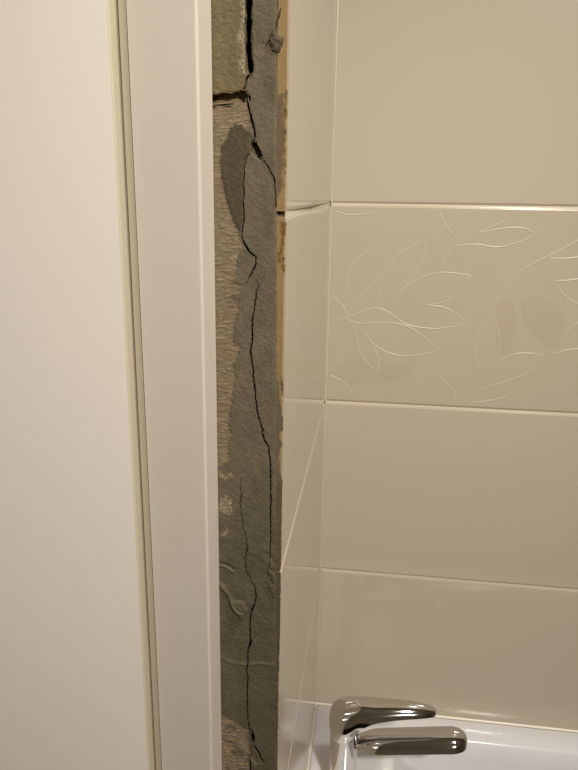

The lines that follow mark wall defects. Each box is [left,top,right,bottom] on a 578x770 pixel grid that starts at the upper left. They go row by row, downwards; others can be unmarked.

spalling [236,0,245,75]
spalling [249,138,265,162]
crack [240,72,280,559]
crack [238,478,257,770]